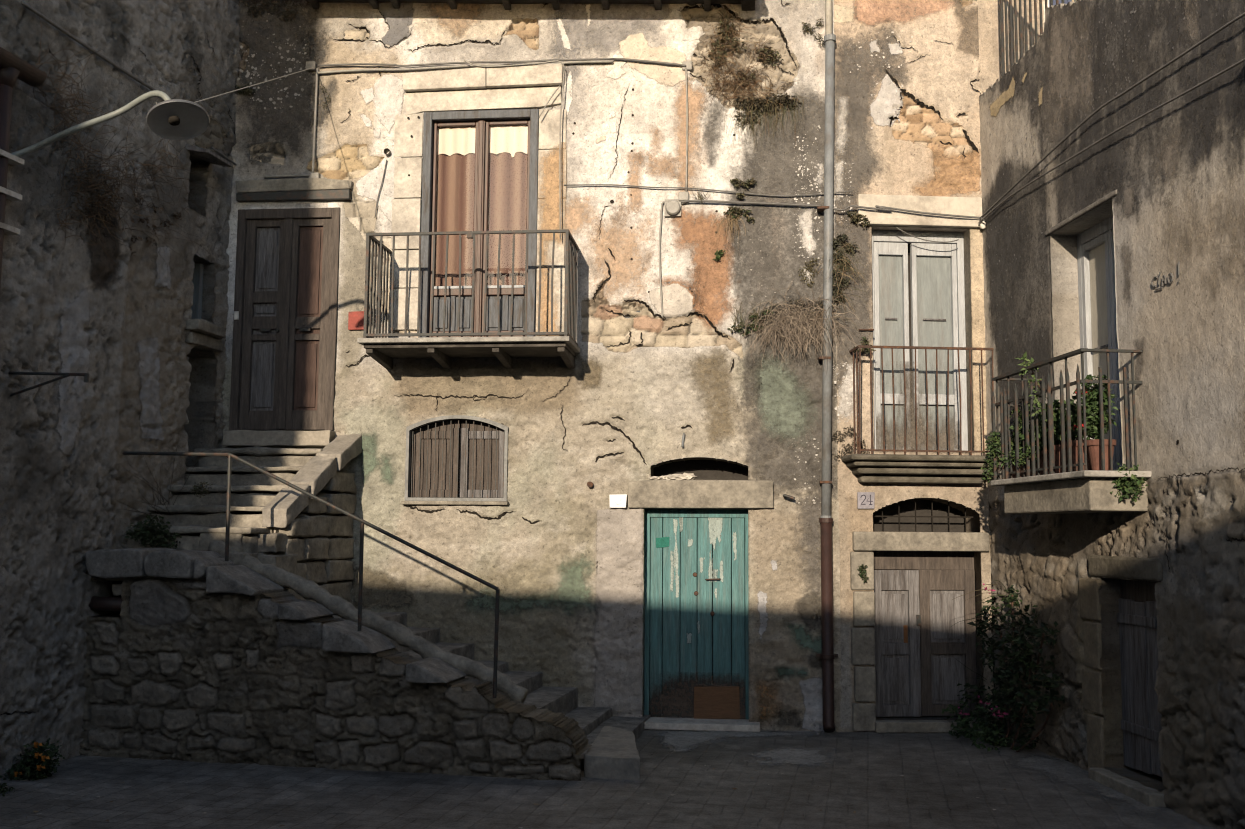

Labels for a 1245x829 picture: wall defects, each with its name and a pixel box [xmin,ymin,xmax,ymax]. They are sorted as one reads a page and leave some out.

peeling [344,3,414,46]
crack [333,8,509,123]
spalling [504,18,539,50]
spalling [606,4,800,108]
peeling [869,41,902,55]
spalling [869,74,981,194]
peeling [307,74,417,333]
damp [982,0,1245,472]
crack [394,373,647,465]
damp [579,357,602,389]
spalling [581,281,743,359]
damp [692,28,914,629]